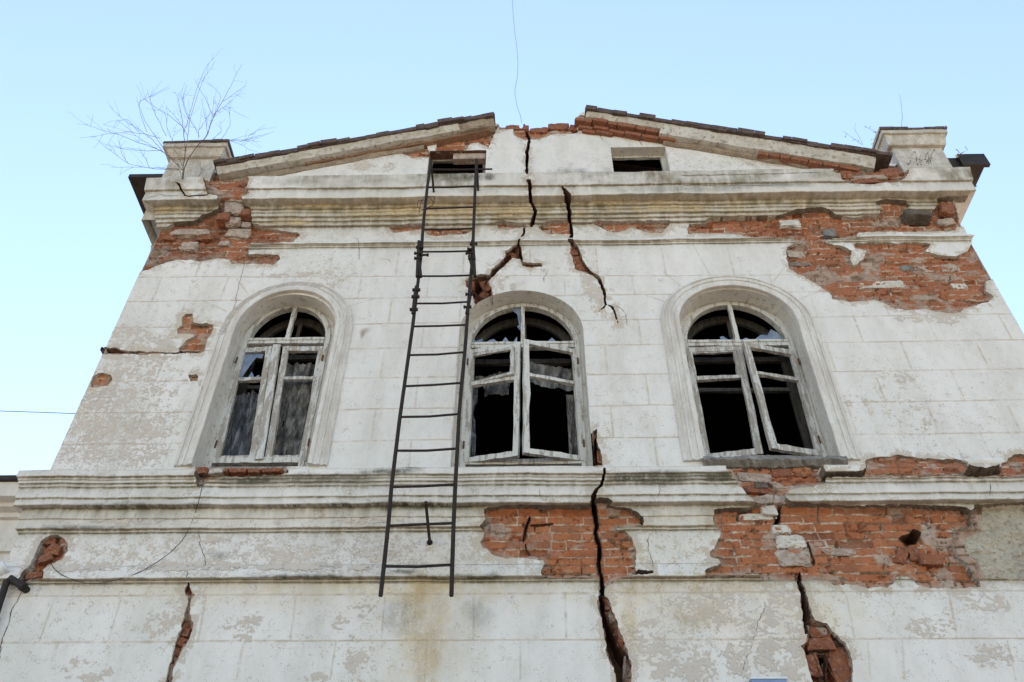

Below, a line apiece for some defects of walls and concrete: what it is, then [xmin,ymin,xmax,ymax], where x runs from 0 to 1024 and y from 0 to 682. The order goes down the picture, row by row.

flaking render [407,115,675,158]
spalling [142,173,343,288]
crack [472,124,537,302]
crack [561,186,627,324]
spalling [687,195,993,327]
peeling [58,314,213,467]
crack [165,530,206,682]
spalling [480,497,659,596]
crack [591,432,632,682]
crack [772,506,782,528]
crack [797,542,830,682]
spalling [627,454,1024,682]